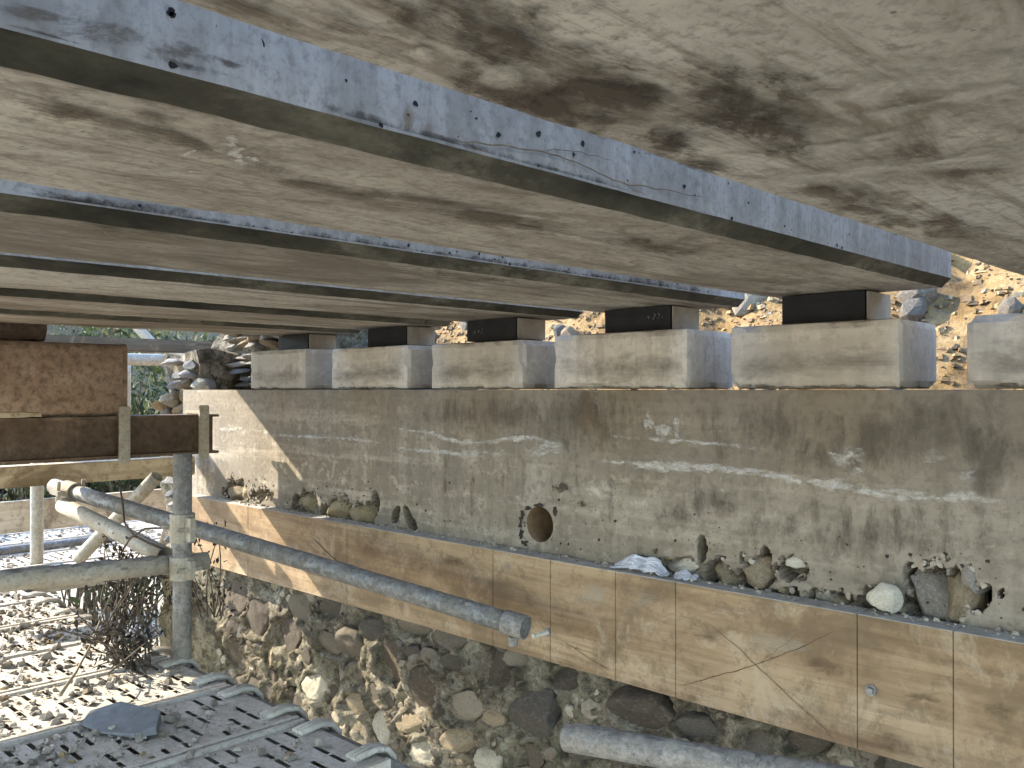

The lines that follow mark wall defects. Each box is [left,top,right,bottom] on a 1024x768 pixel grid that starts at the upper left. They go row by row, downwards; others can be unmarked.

water stain [36,94,221,158]
crack [449,139,705,198]
water stain [247,157,551,235]
water stain [792,187,985,239]
water stain [409,430,486,459]
spalling [224,472,274,504]
spalling [292,481,417,530]
water stain [612,461,903,500]
spalling [715,546,1005,624]